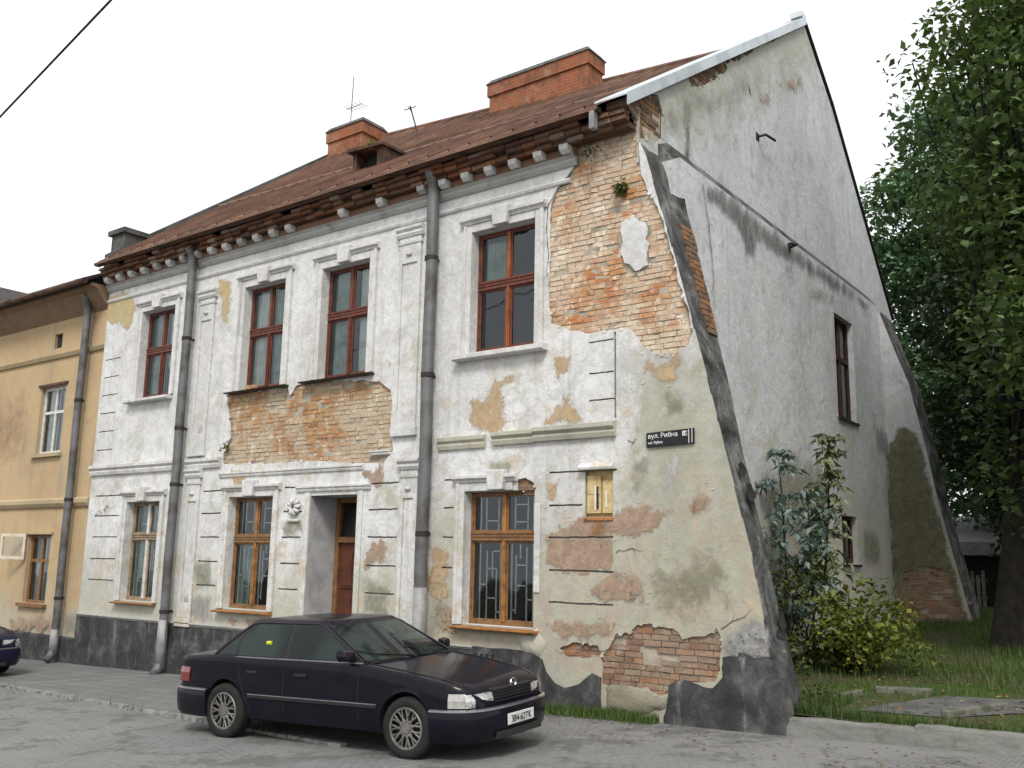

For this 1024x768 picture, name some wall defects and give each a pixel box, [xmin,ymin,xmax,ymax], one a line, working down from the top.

spalling [548,94,718,387]
water stain [708,187,868,307]
peeling [105,291,136,331]
peeling [219,279,234,331]
spalling [223,379,393,488]
peeling [469,375,513,434]
peeling [544,352,592,425]
peeling [363,539,387,571]
peeling [428,546,464,639]
peeling [540,500,673,604]
spalling [897,566,971,622]
spalling [546,610,787,697]